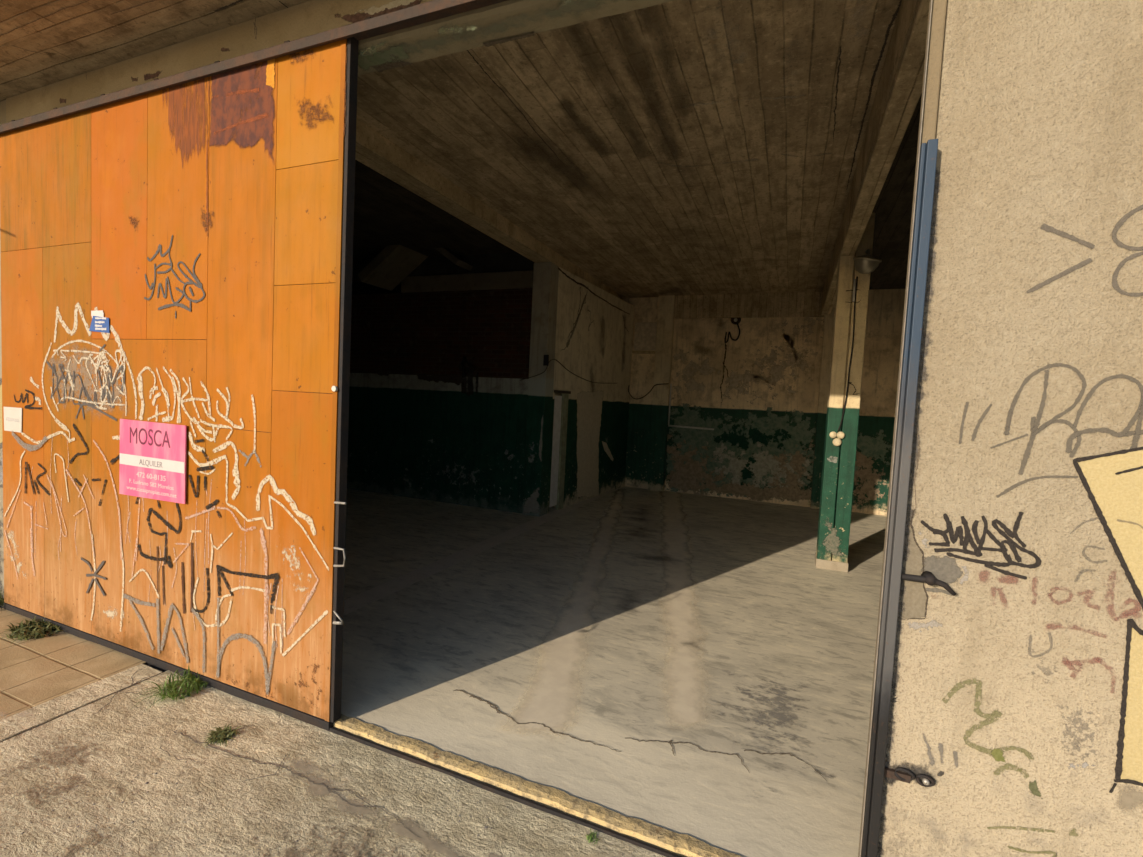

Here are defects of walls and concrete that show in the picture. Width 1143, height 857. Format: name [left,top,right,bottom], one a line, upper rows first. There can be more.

corrosion [300,47,347,133]
water stain [609,14,677,159]
peeling [664,317,837,501]
peeling [822,522,844,556]
flaking render [899,400,969,632]
crack [0,664,172,741]
crack [454,689,827,781]